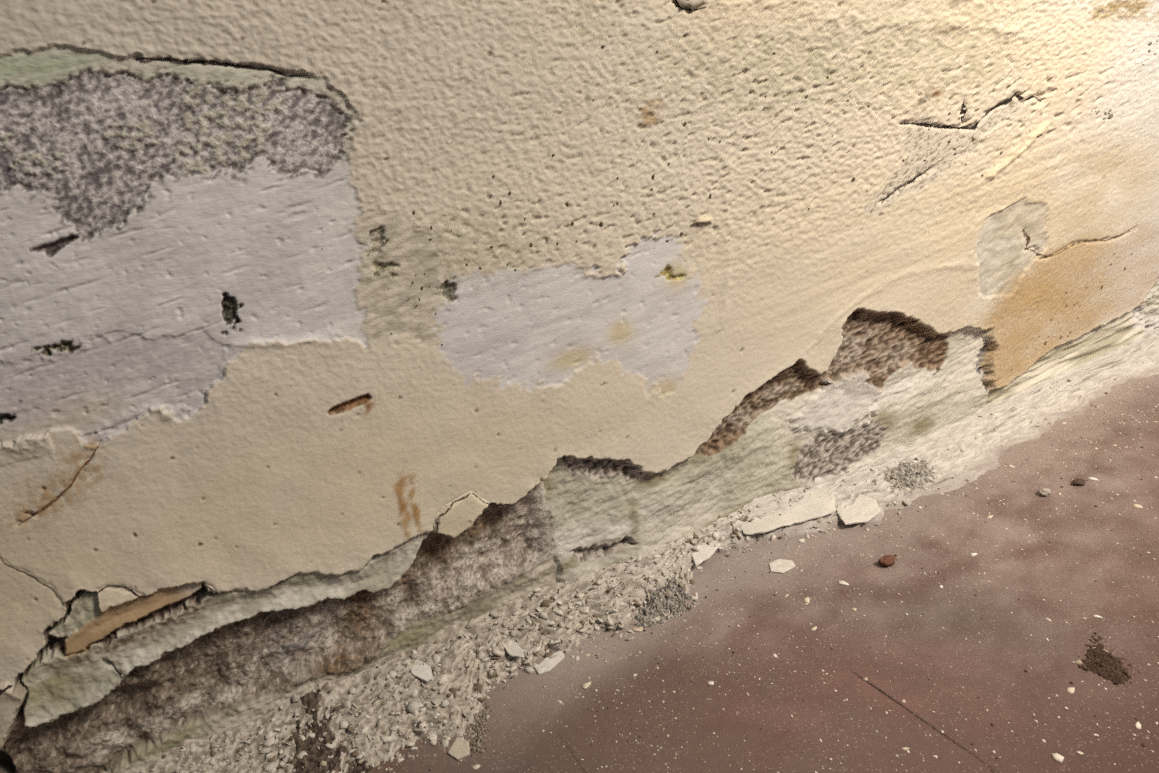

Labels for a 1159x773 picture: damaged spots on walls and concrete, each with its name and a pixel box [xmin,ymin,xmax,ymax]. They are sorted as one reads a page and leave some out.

peeling [677,0,704,11]
peeling [0,45,709,446]
peeling [975,199,1050,298]
leakage [988,245,1133,388]
crack [19,442,101,525]
spalling [0,271,1159,773]